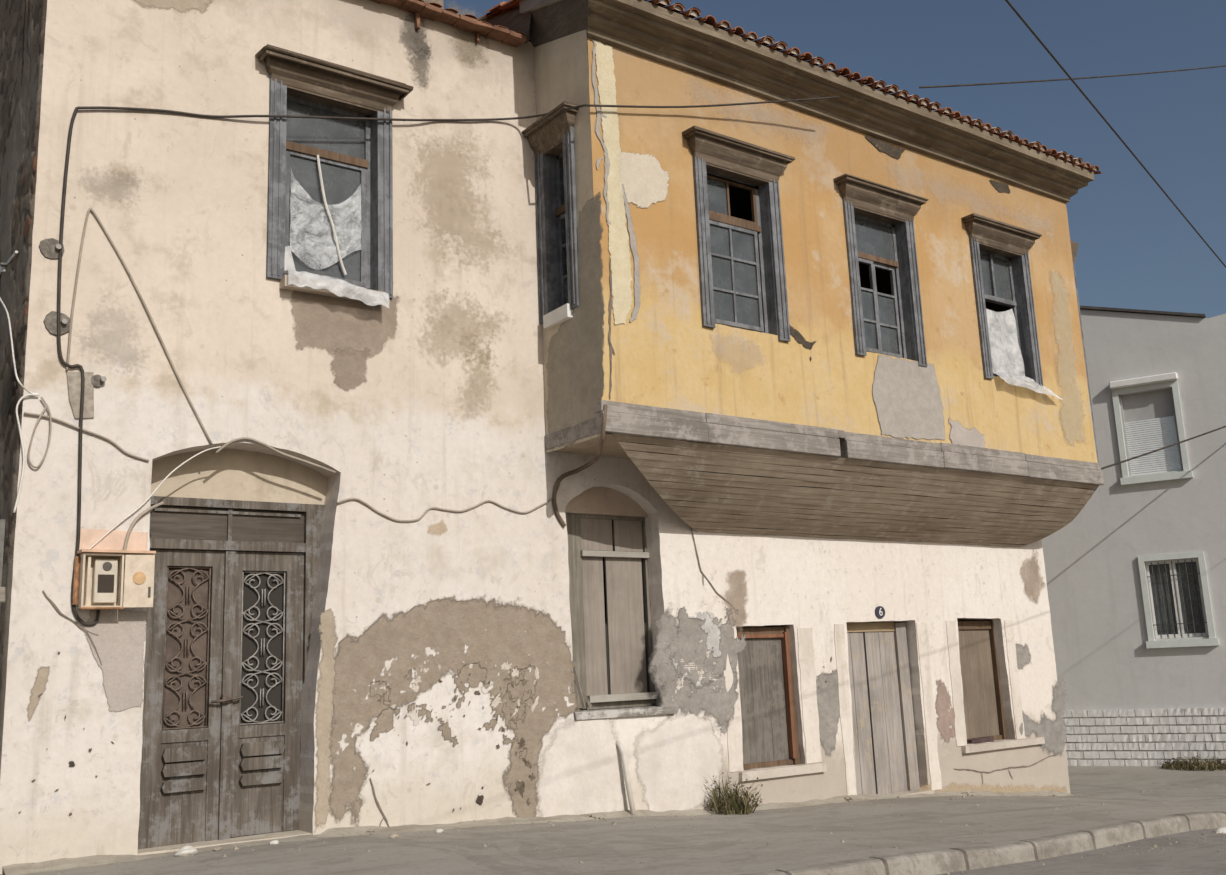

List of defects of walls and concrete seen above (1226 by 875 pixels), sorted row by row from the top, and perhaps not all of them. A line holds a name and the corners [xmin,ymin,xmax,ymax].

peeling [134,0,212,12]
peeling [546,40,670,433]
peeling [872,355,985,448]
peeling [315,596,580,826]
peeling [649,607,746,736]
spalling [816,656,840,756]
peeling [935,679,955,742]